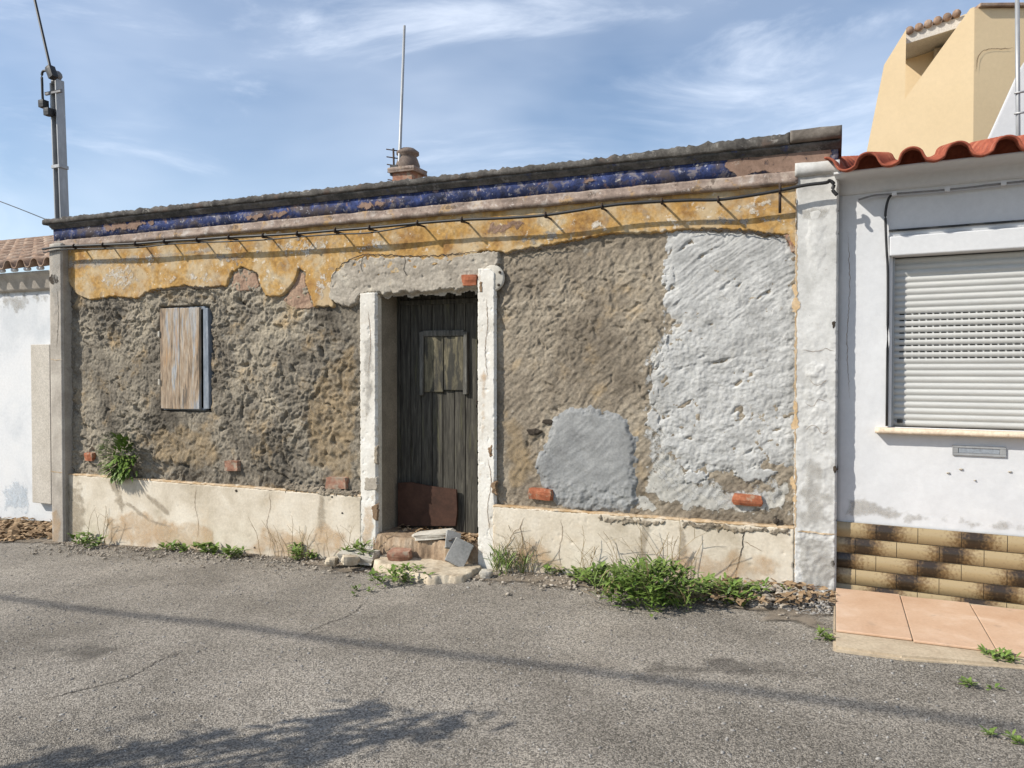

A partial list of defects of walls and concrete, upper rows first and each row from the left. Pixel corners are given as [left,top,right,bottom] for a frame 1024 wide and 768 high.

peeling [357,200,393,210]
peeling [246,211,287,220]
peeling [103,220,154,232]
peeling [277,238,328,255]
spalling [700,200,795,287]
flaking render [461,274,483,292]
spalling [70,246,380,521]
spalling [487,221,795,535]
crack [688,183,851,579]